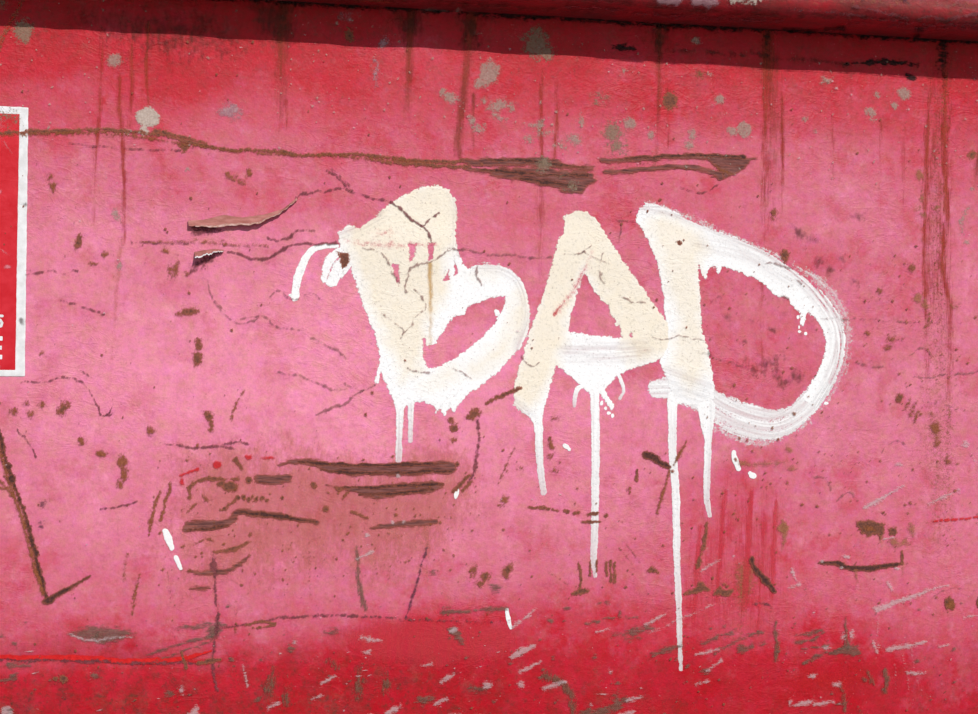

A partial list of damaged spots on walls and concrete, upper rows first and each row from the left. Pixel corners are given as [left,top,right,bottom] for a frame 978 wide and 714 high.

peeling [657,0,762,8]
peeling [518,24,555,62]
peeling [475,59,500,87]
peeling [469,99,515,131]
peeling [601,119,635,154]
peeling [188,198,297,235]
corrosion [864,39,978,359]
peeling [190,249,224,273]